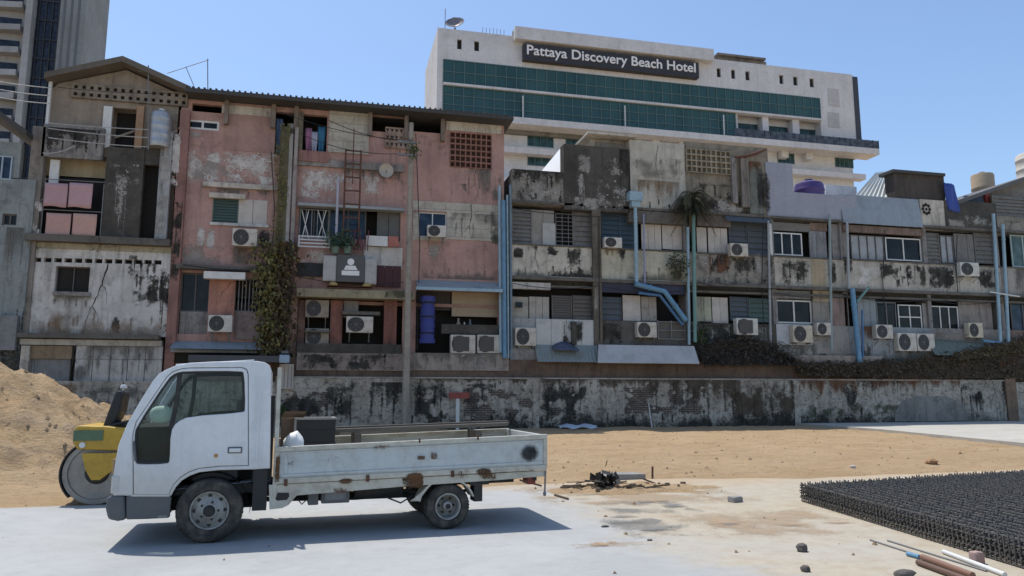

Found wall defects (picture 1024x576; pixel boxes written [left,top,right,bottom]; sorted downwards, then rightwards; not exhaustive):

water stain [115,175,128,223]
peeling [157,127,277,236]
peeling [299,168,384,201]
water stain [462,168,564,203]
water stain [45,200,183,378]
water stain [513,246,592,278]
water stain [703,252,809,284]
water stain [880,263,954,292]
crack [70,264,108,381]
water stain [280,382,356,424]
water stain [369,378,1017,430]